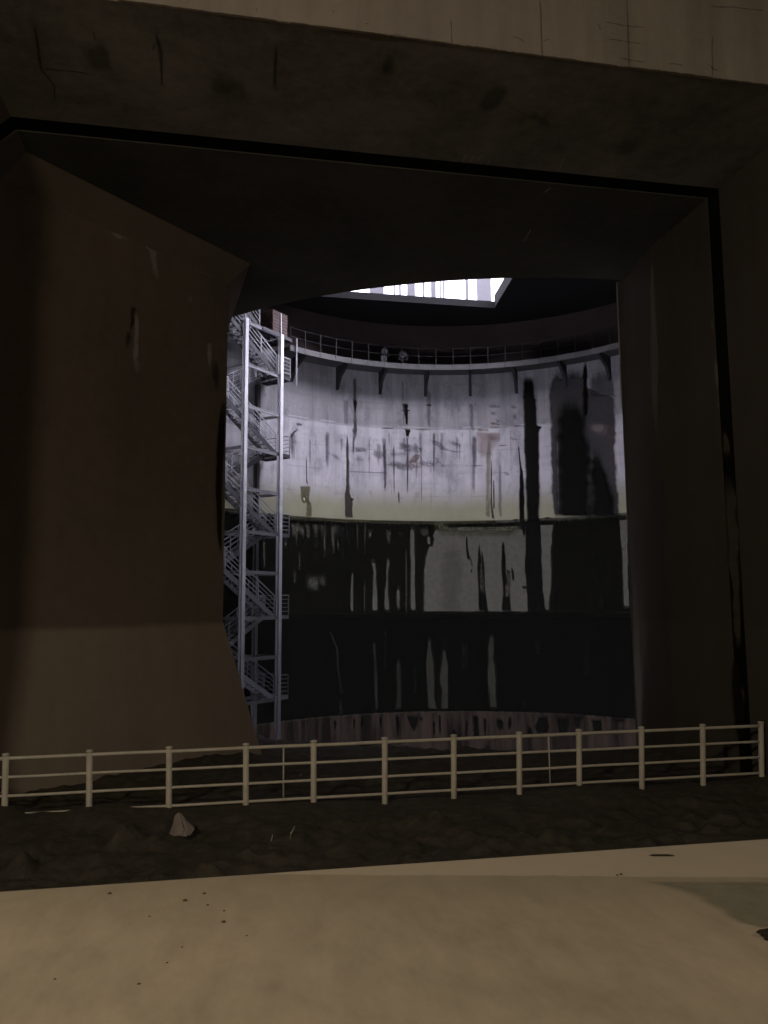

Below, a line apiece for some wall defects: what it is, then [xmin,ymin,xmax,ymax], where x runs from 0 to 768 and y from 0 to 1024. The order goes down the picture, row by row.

damp [216,364,635,736]